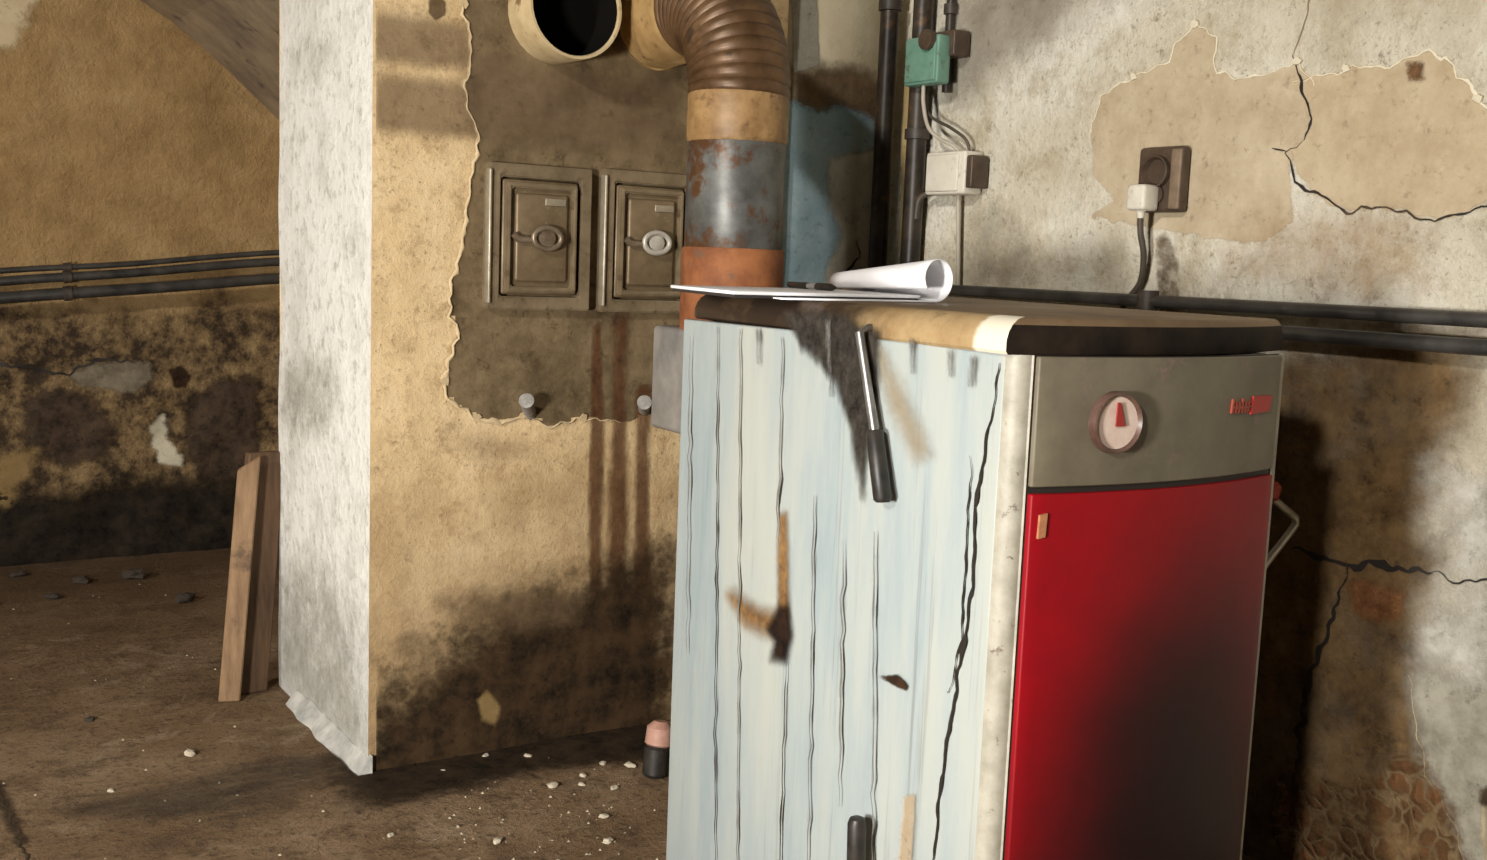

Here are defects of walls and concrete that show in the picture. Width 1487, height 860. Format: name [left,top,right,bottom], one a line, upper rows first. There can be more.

flaking render [429,0,688,429]
peeling [782,101,874,290]
flaking render [1091,20,1487,242]
crack [1272,0,1487,222]
crack [0,783,29,860]
water stain [0,476,237,567]
flaking render [0,362,262,506]
water stain [333,356,690,806]
corrosion [589,318,649,589]
water stain [1242,325,1487,860]
flaking render [1271,672,1487,860]
crack [1290,546,1487,811]